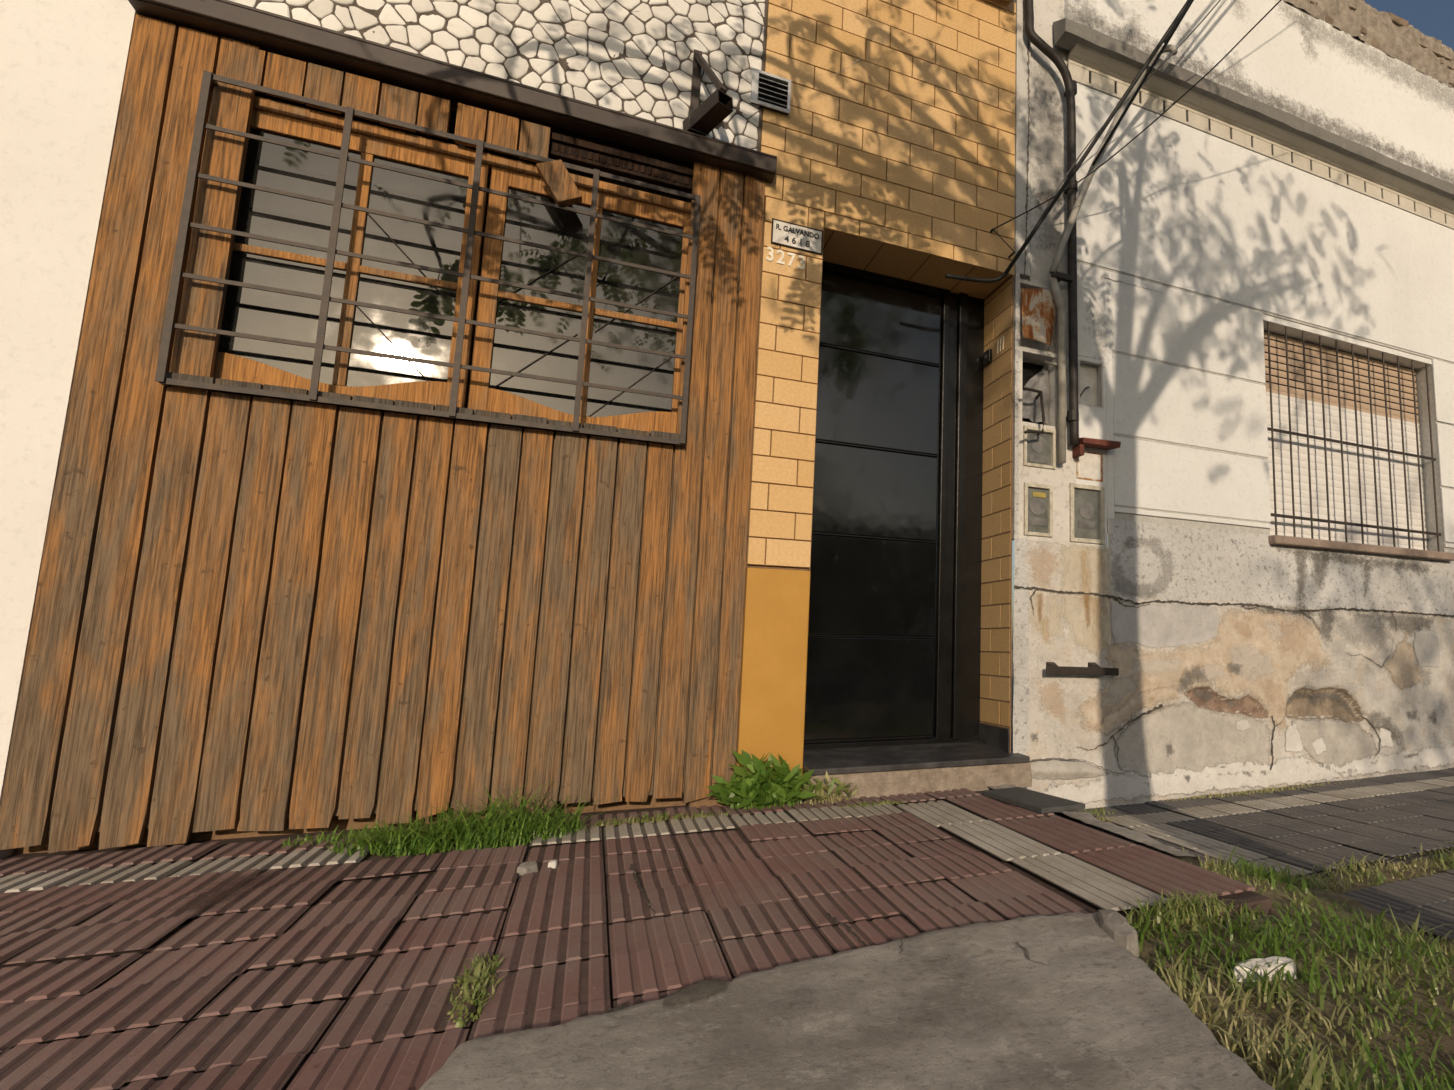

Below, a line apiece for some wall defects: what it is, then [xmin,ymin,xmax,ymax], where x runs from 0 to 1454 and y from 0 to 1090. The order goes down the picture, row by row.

crack [1014,585,1454,668]
water stain [1248,547,1433,644]
flaking render [1044,607,1454,804]